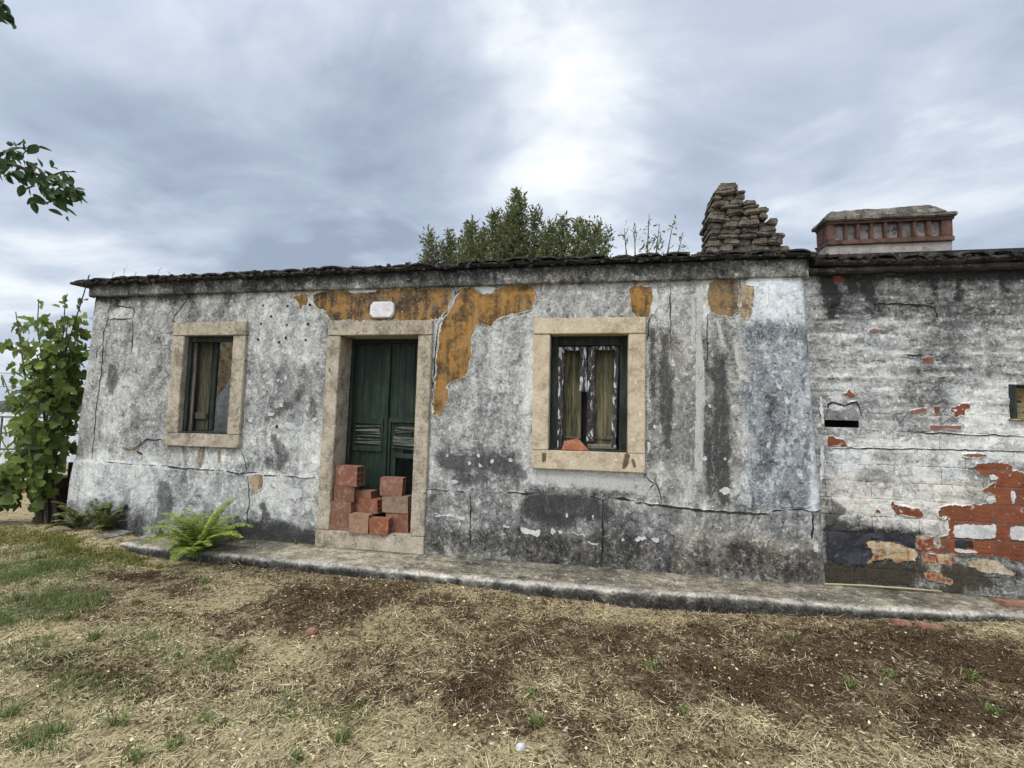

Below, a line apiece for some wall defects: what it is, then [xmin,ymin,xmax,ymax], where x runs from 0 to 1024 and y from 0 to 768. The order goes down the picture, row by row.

flaking render [627,284,659,319]
flaking render [706,279,757,323]
crack [92,303,316,538]
peeling [248,403,295,436]
flaking render [286,285,538,416]
crack [427,278,822,563]
damp [686,286,742,506]
peeling [794,391,848,483]
flaking render [909,403,971,432]
damp [435,451,649,528]
flaking render [813,452,1024,585]